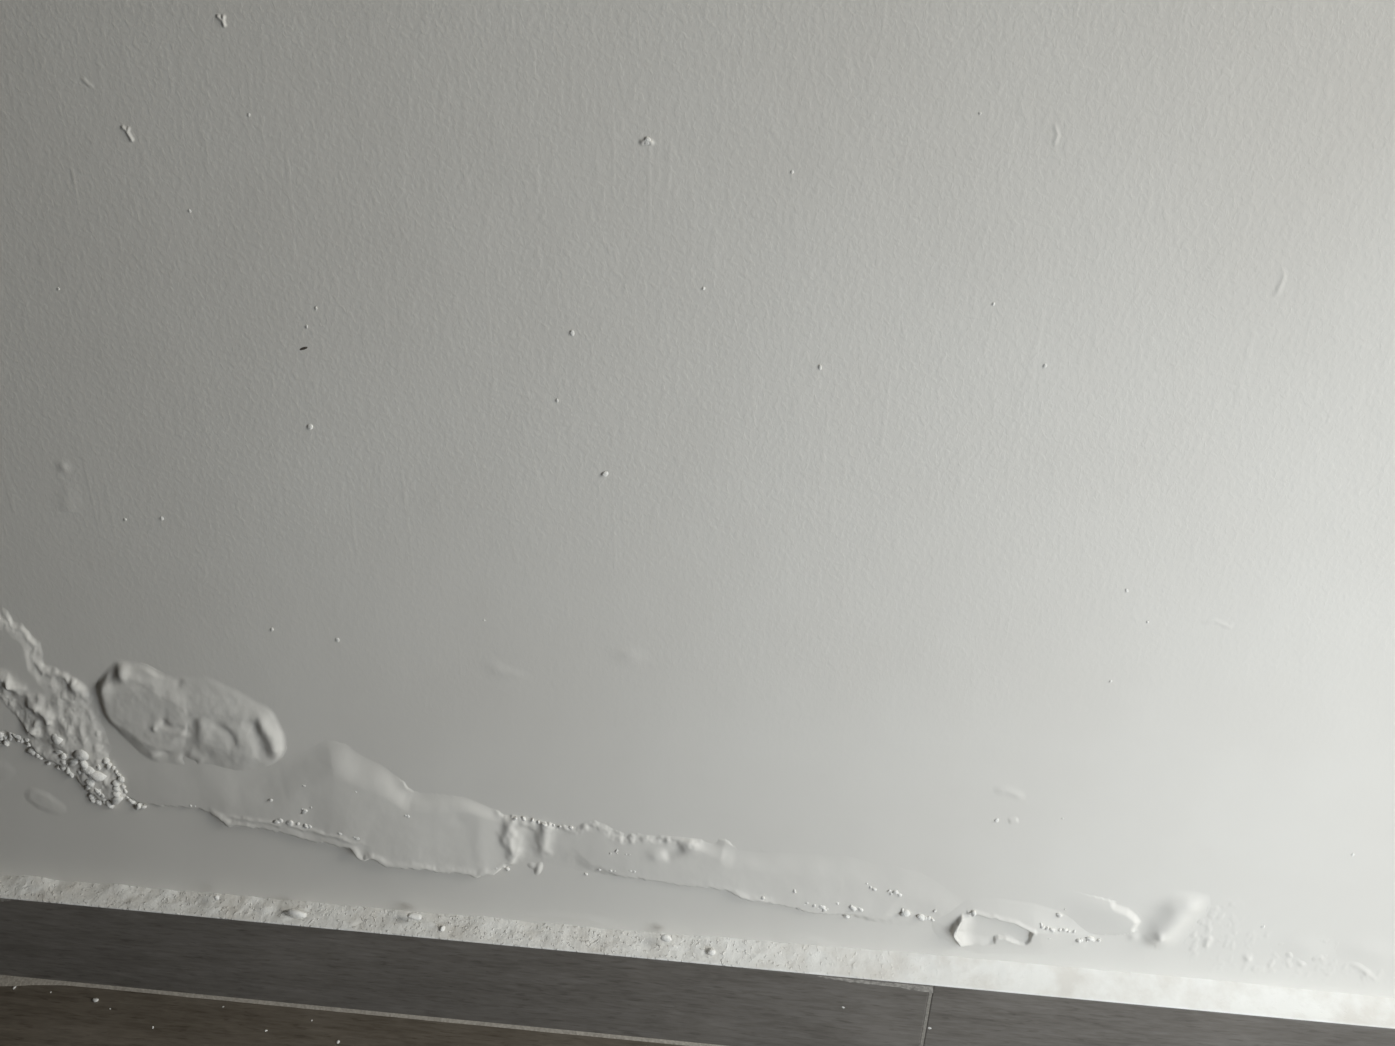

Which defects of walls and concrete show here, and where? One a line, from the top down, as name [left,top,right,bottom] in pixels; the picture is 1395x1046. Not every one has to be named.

peeling [123,740,1101,955]